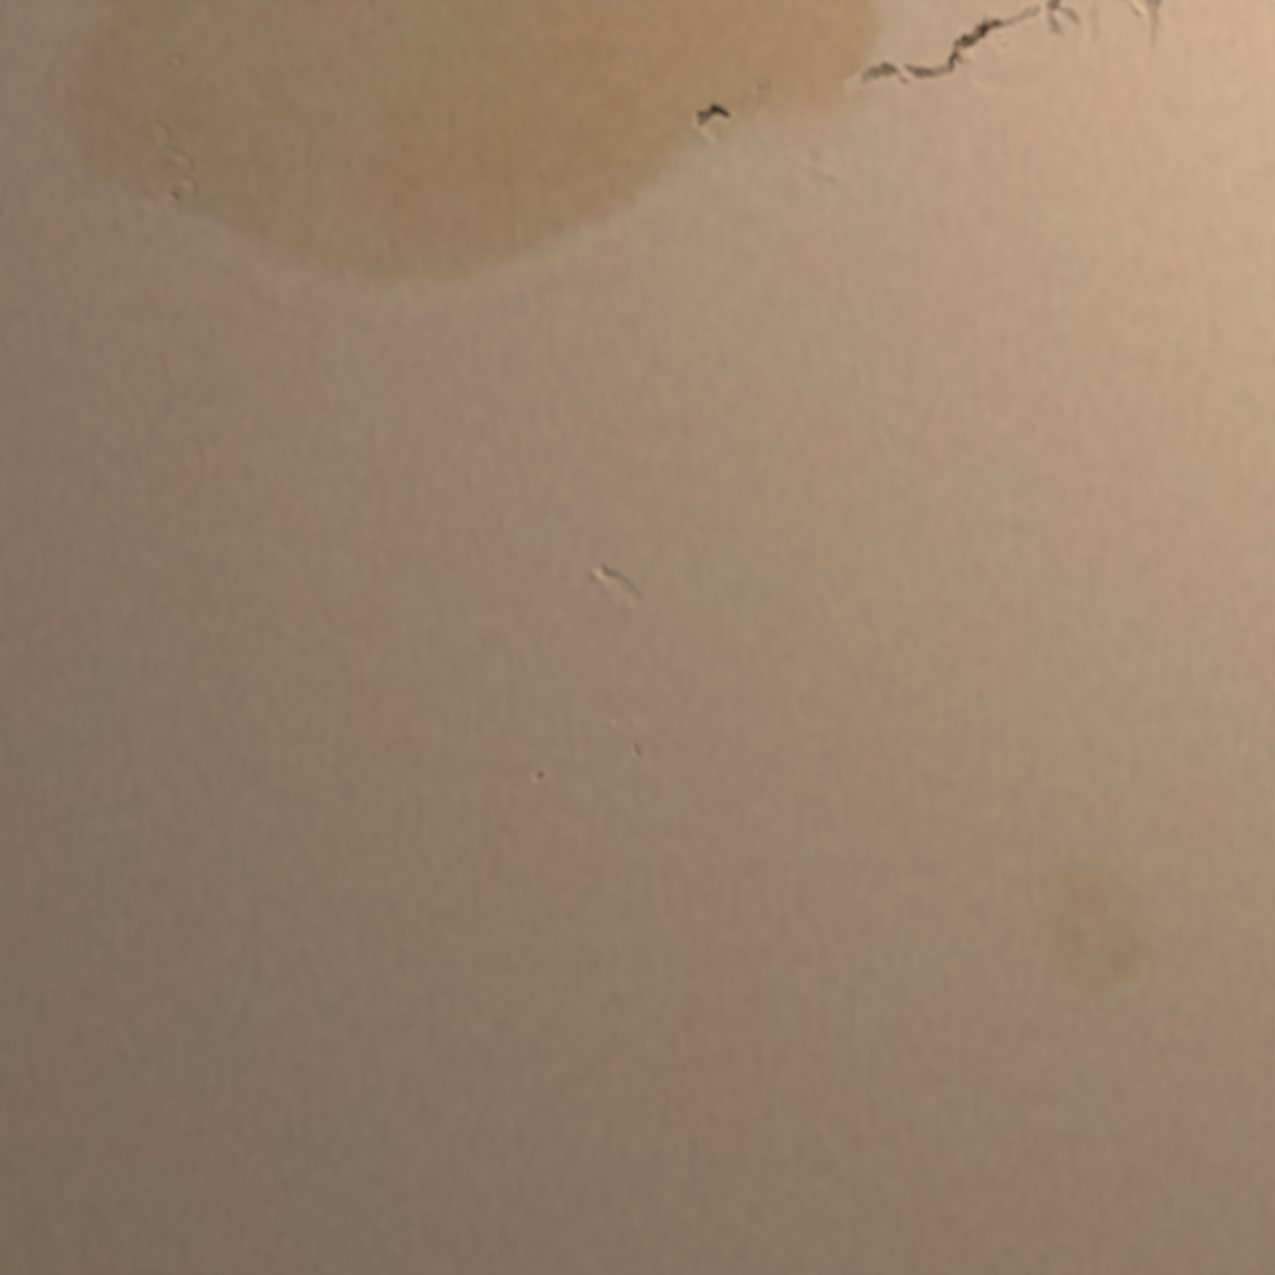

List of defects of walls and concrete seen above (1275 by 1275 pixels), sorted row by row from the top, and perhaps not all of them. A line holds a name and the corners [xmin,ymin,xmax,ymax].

water stain [37,0,897,329]
crack [843,0,1104,97]